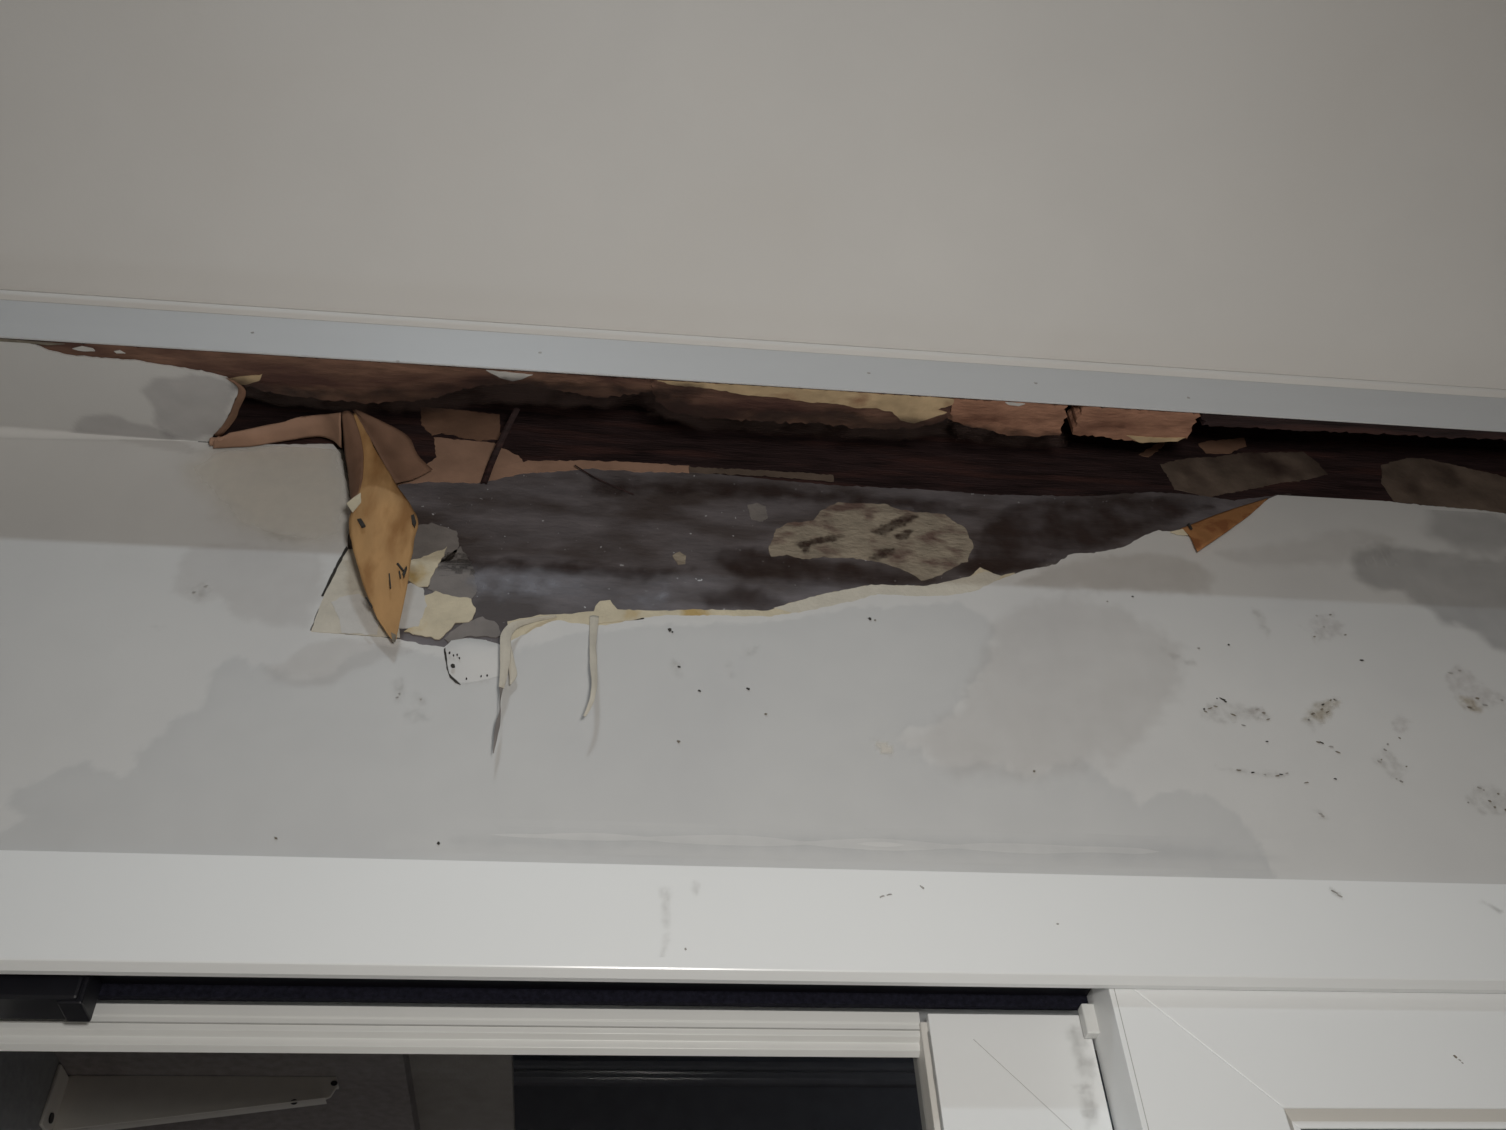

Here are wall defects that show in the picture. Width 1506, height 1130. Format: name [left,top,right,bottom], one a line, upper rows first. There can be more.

peeling [657,380,954,423]
peeling [1381,458,1506,514]
peeling [372,407,1328,647]